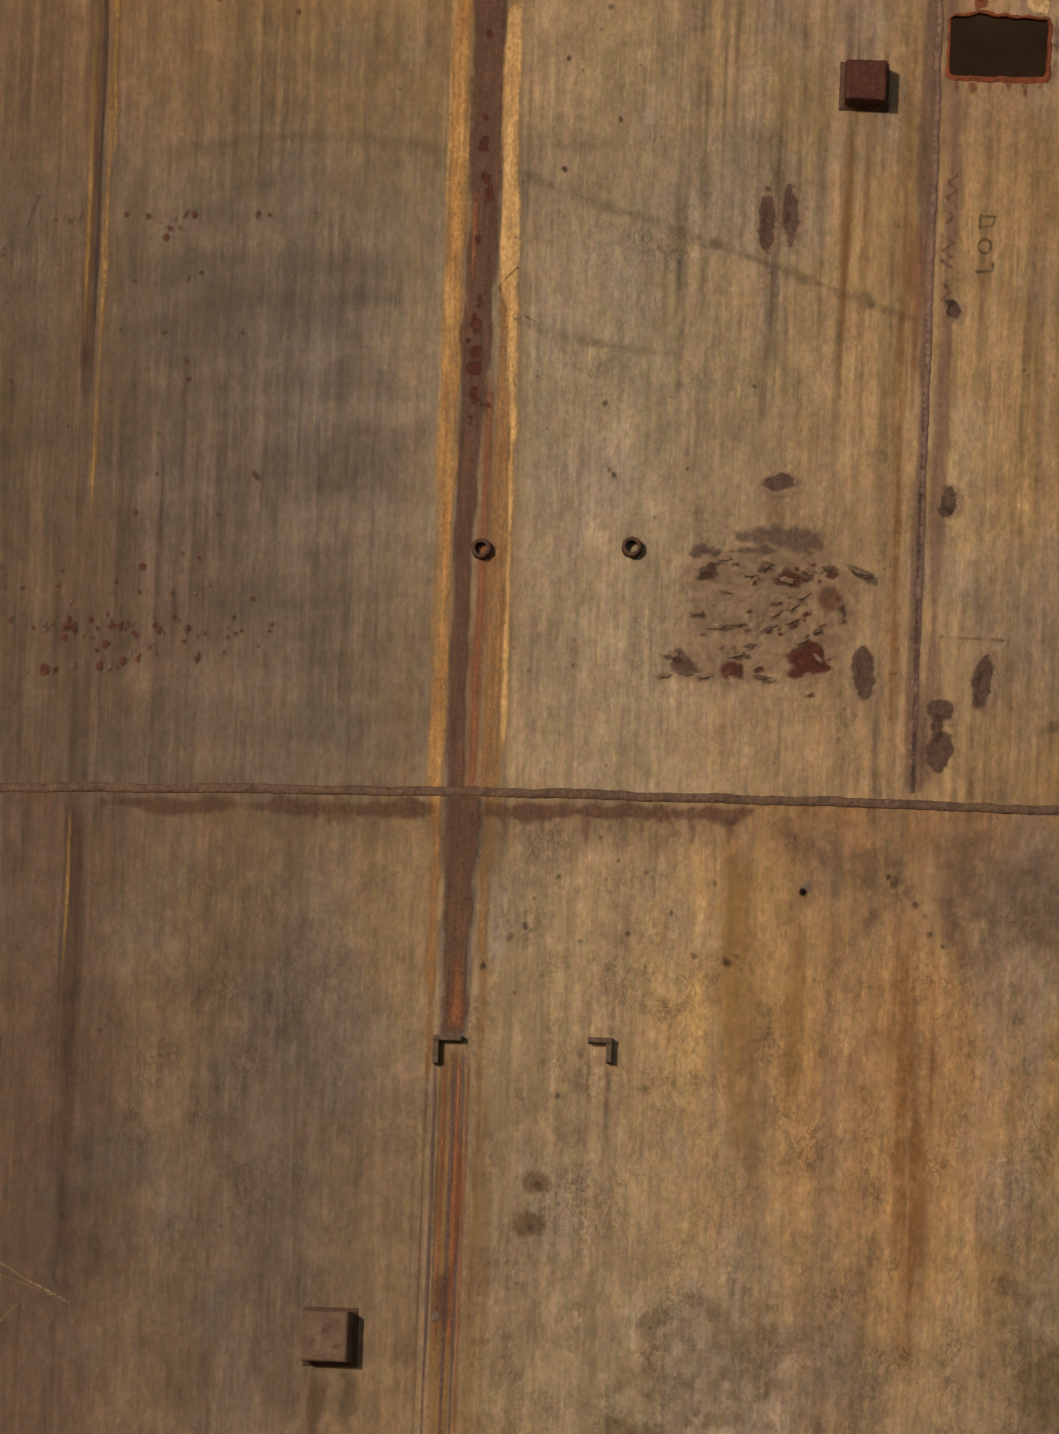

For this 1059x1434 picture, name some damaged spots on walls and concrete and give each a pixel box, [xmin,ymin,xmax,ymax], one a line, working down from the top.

rust [757,184,805,255]
rust [893,0,961,784]
peeling [659,528,877,682]
rust [259,0,753,1434]
rust [852,646,880,699]
rust [971,655,999,709]
rust [103,797,224,815]